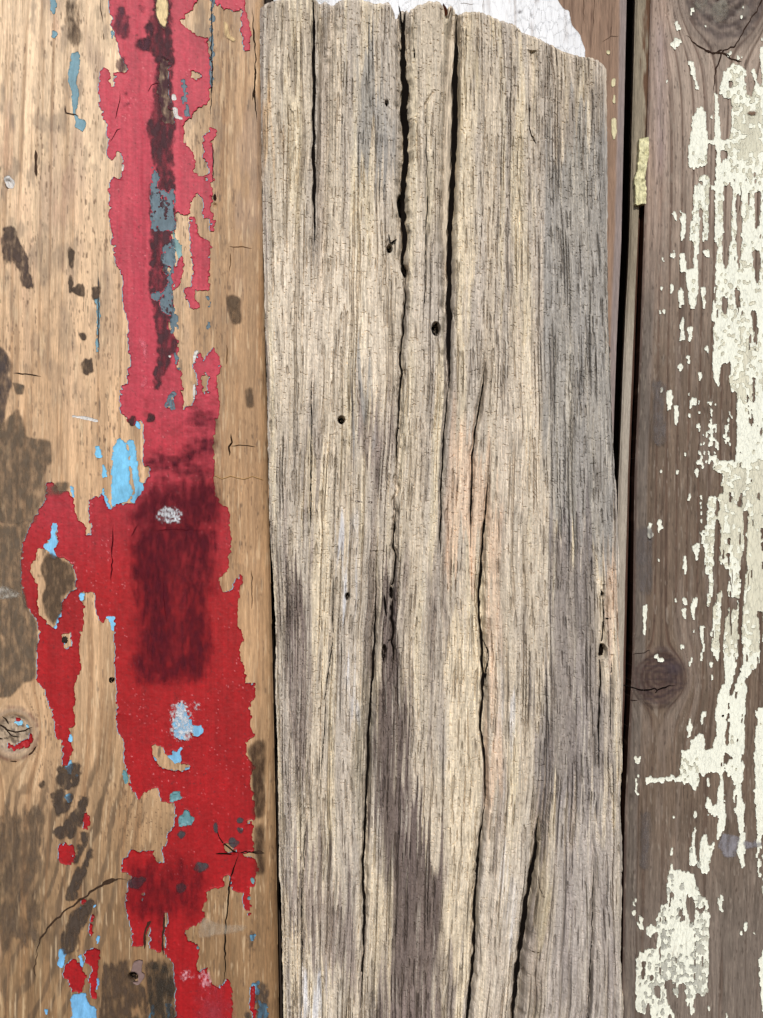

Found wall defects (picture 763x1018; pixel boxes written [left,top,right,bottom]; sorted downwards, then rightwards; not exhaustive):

peeling [363,0,585,57]
peeling [670,21,682,50]
crack [688,0,762,92]
peeling [4,175,15,189]
crack [388,0,484,552]
peeling [20,0,259,1018]
peeling [632,37,763,1018]
peeling [7,717,33,751]
crack [466,364,489,1018]
crack [216,833,264,982]
crack [511,816,545,1018]
peeling [248,980,269,1018]